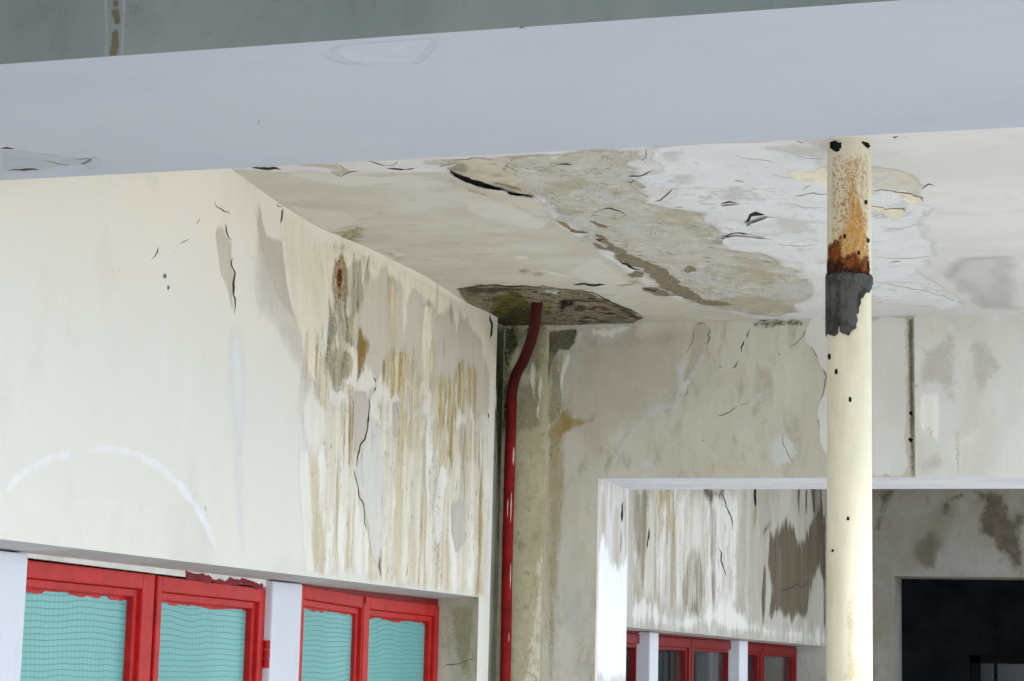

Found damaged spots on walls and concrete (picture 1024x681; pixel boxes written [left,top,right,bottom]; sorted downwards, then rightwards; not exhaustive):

spalling [424,139,827,318]
rust [827,154,870,275]
crack [353,378,376,531]
leakage [232,163,826,681]
crack [792,331,827,425]
leakage [874,489,895,530]
peeling [871,167,1001,476]
leakage [911,489,1024,572]